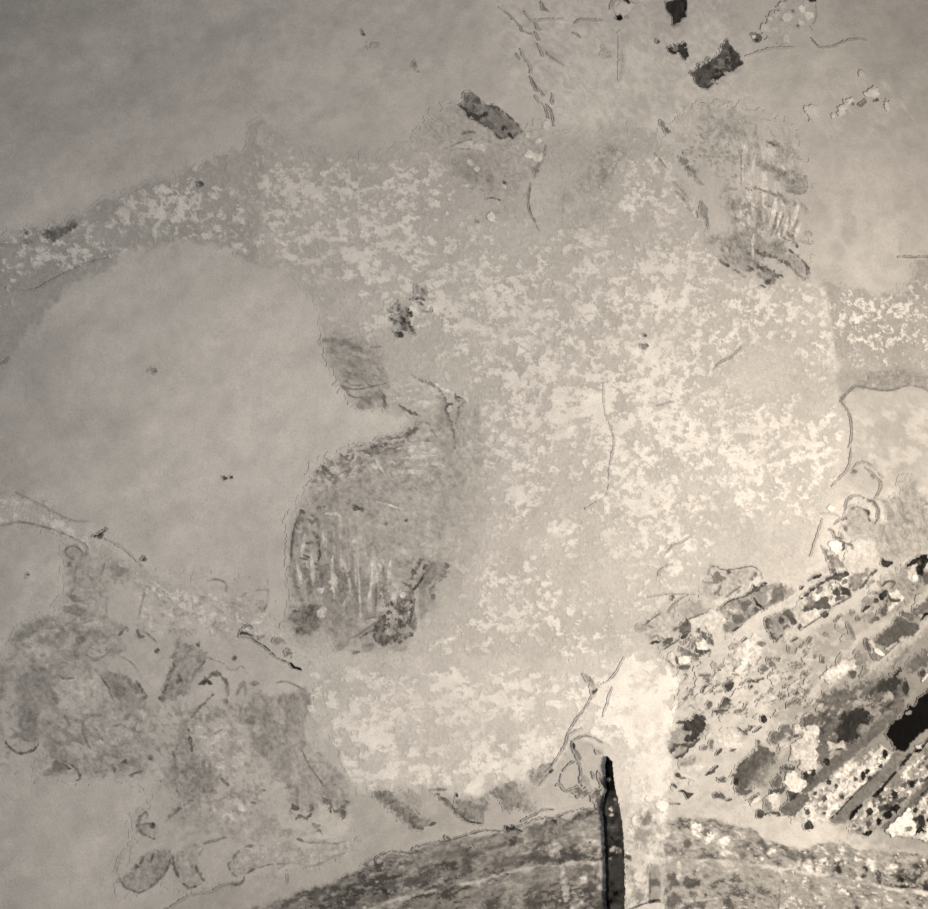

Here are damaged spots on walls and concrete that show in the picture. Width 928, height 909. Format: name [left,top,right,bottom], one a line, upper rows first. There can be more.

spalling [665,0,688,26]
spalling [655,38,689,61]
spalling [689,39,744,91]
spalling [459,90,525,141]
water stain [678,150,706,186]
water stain [388,283,434,338]
crack [832,384,928,487]
flaking render [0,116,928,814]
crack [810,512,843,557]
water stain [582,673,598,697]
water stain [631,810,658,851]
water stain [624,853,666,908]